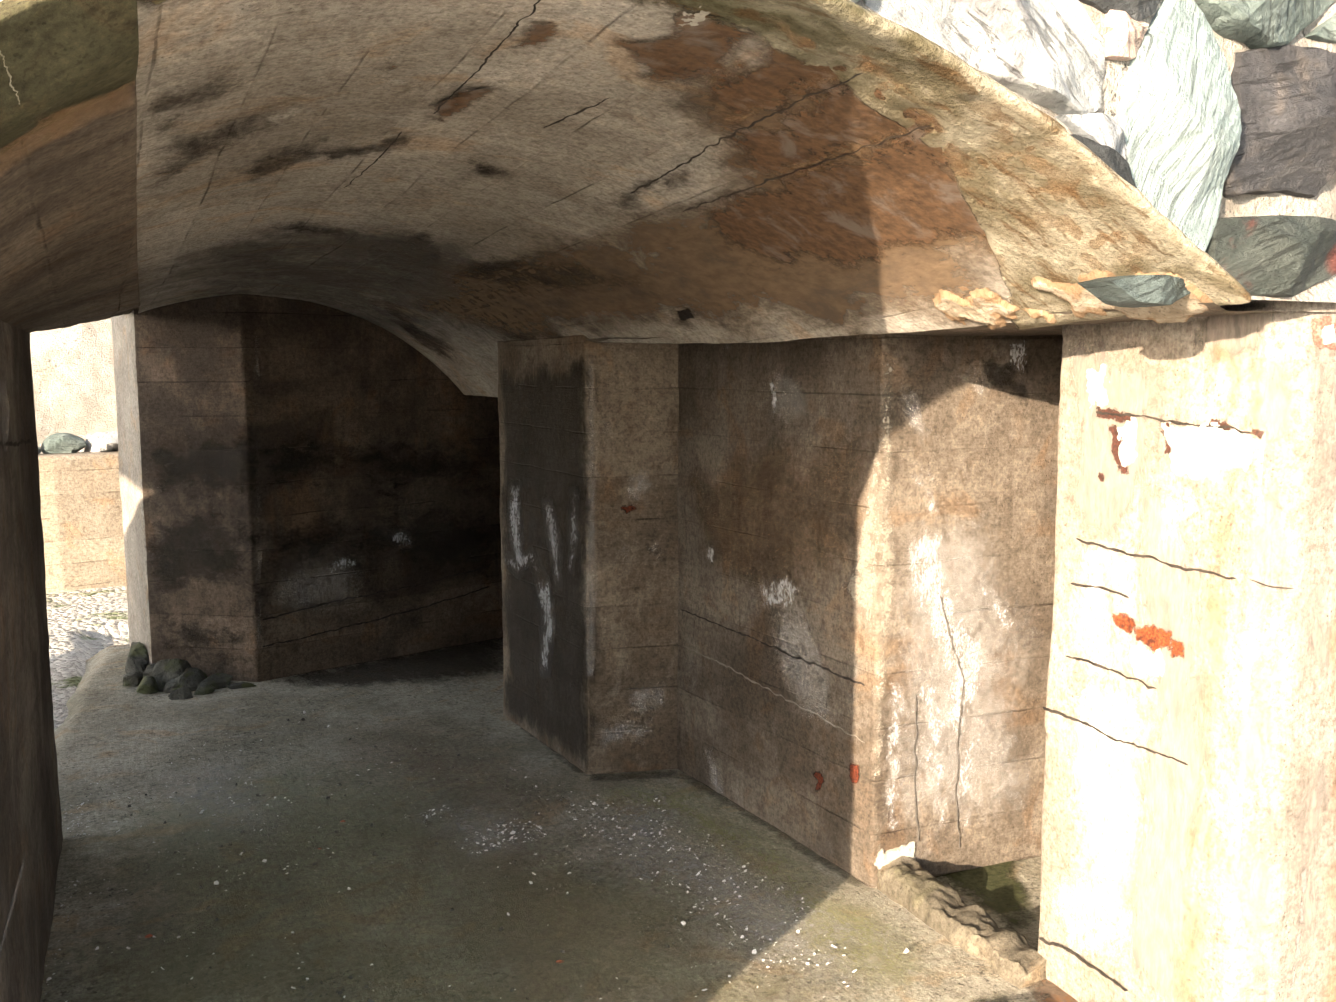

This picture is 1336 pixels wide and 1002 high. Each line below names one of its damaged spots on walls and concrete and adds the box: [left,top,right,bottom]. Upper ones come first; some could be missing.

damp [248,137,409,179]
damp [417,75,991,340]
damp [391,309,448,355]
spalling [1086,363,1110,409]
spalling [1117,417,1138,467]
spalling [1161,421,1261,486]
crack [1076,538,1295,589]
crack [1071,583,1129,598]
corrosion [1112,612,1184,658]
crack [1066,655,1156,689]
crack [940,595,964,848]
crack [1043,707,1188,765]